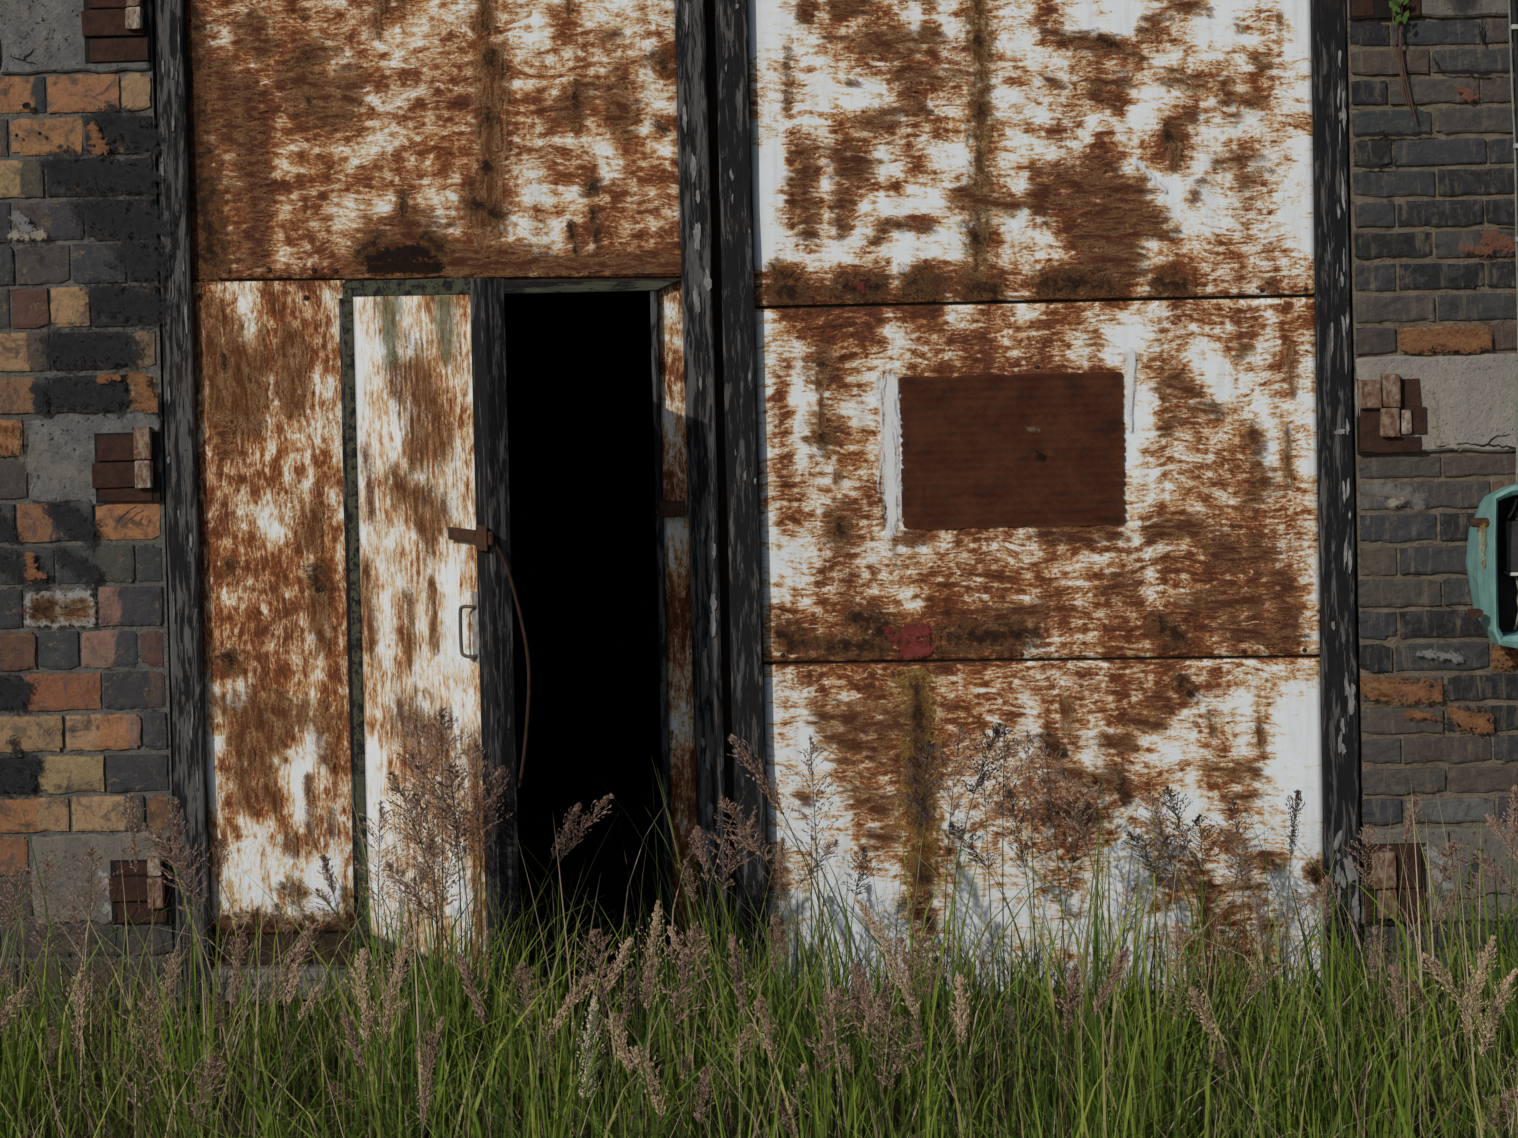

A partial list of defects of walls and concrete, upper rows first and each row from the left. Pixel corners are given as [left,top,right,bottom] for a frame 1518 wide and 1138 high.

rust [185,0,365,460]
rust [438,0,681,278]
rust [759,0,1278,305]
rust [800,343,859,553]
rust [880,362,1310,657]
rust [205,644,341,897]
rust [211,905,355,934]
rust [360,329,487,959]
rust [805,667,942,931]
rust [1032,669,1216,834]
rust [1155,826,1291,943]
rust [1202,720,1267,805]